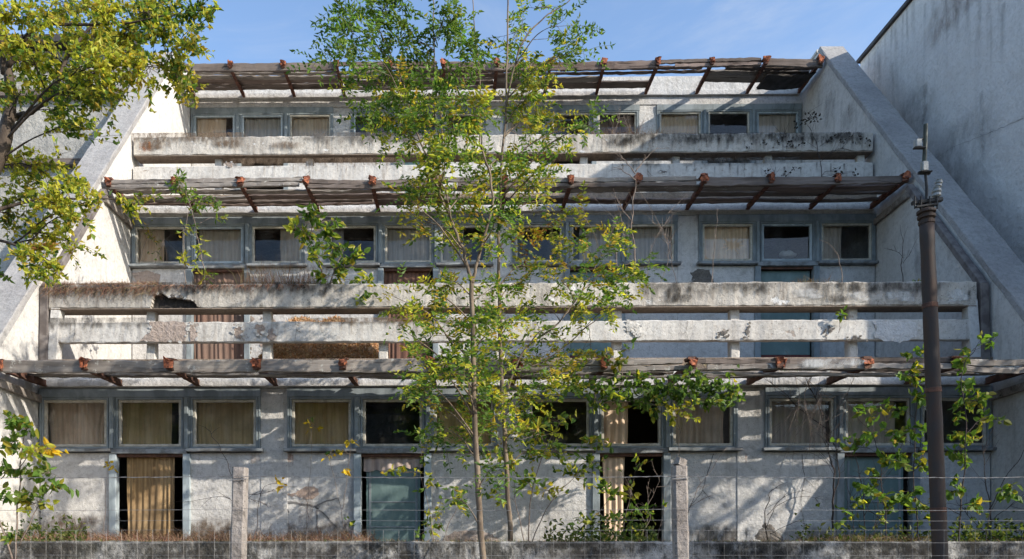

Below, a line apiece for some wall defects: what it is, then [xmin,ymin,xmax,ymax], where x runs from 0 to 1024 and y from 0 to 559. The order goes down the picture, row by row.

leakage [132,132,241,149]
leakage [615,133,666,145]
leakage [679,132,862,143]
leakage [236,142,399,169]
spalling [687,268,714,283]
spalling [132,270,198,308]
mould [647,282,694,302]
leakage [799,282,921,301]
peeling [140,320,199,344]